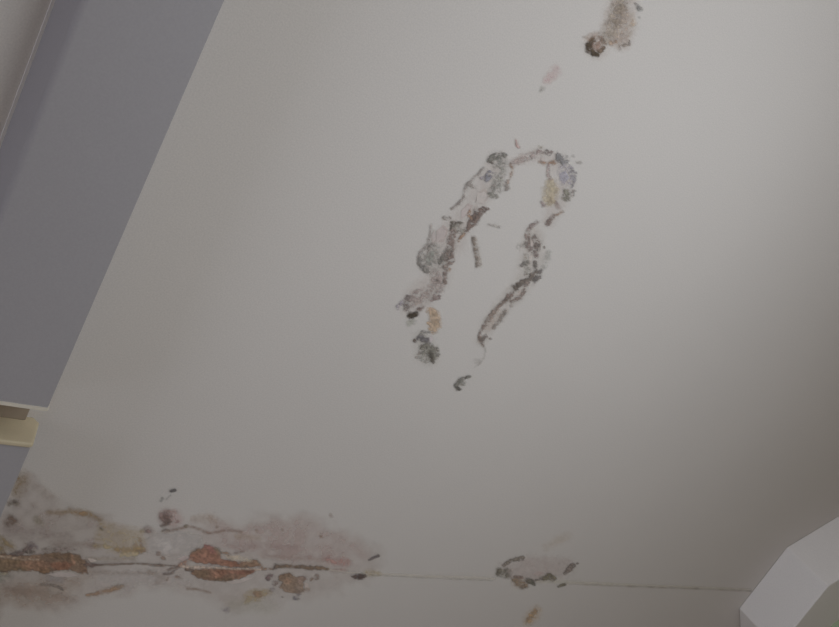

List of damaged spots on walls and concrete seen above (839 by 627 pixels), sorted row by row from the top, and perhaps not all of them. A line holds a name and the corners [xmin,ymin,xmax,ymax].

peeling [396,150,577,364]
crack [96,561,176,569]
crack [273,563,329,571]
crack [352,555,380,580]
peeling [496,556,579,589]